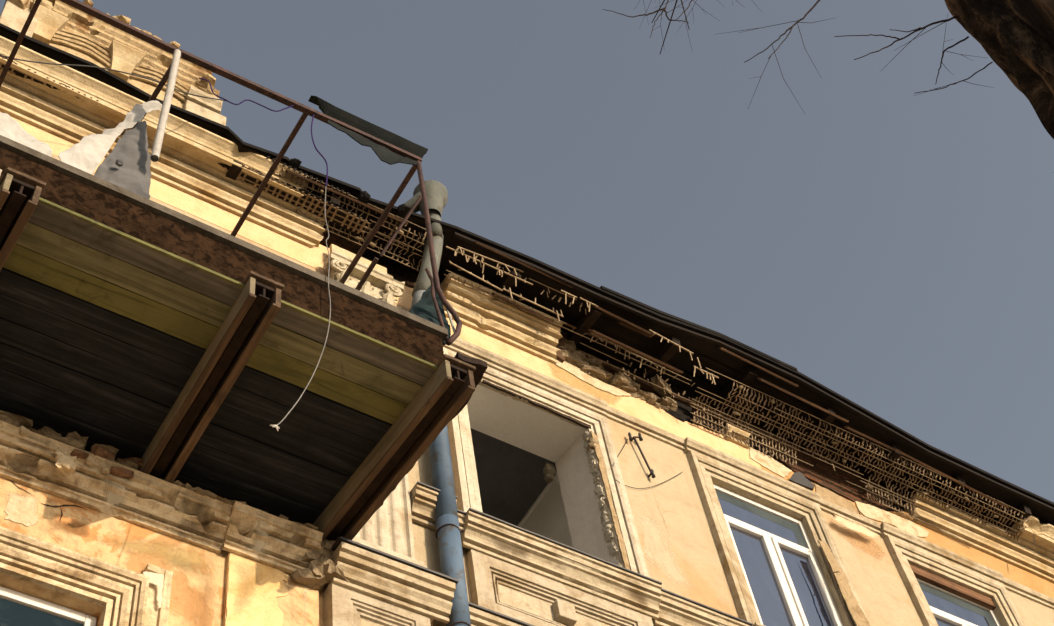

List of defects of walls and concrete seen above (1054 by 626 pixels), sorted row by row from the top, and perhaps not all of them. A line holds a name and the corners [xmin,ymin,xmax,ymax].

spalling [555,337,693,423]
crack [10,480,87,522]
spalling [0,410,144,480]
spalling [172,480,249,506]
spalling [482,380,630,570]
flaking render [749,442,929,538]
peeling [225,514,351,626]